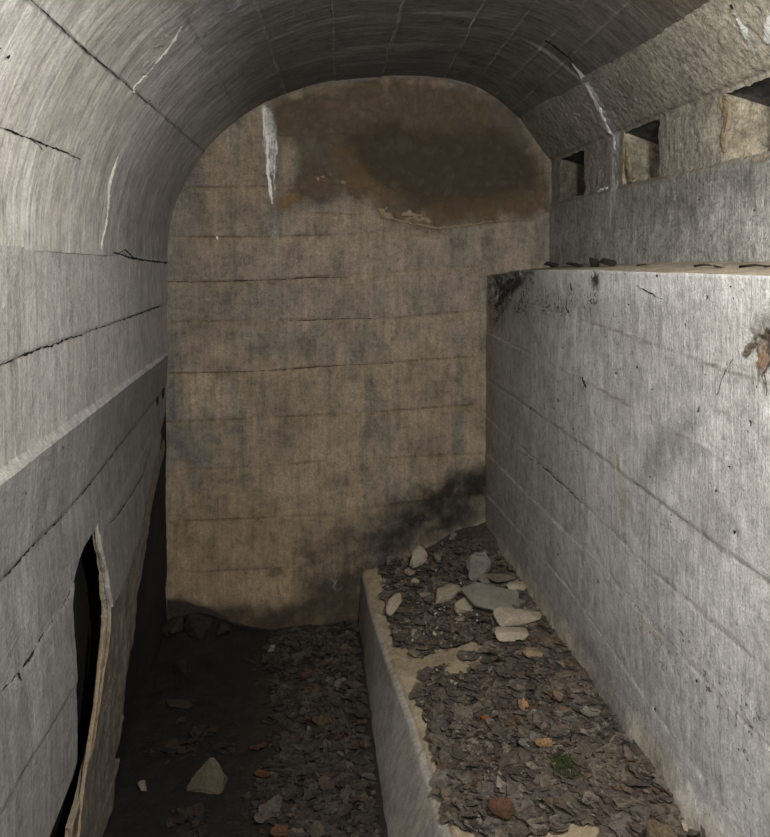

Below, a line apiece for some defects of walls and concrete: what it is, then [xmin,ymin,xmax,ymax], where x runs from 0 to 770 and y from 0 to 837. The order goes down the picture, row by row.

crack [31,0,155,109]
water stain [733,13,754,53]
water stain [762,14,770,44]
crack [0,127,80,159]
water stain [262,75,548,230]
water stain [572,64,620,230]
crack [0,305,160,366]
water stain [366,467,486,569]